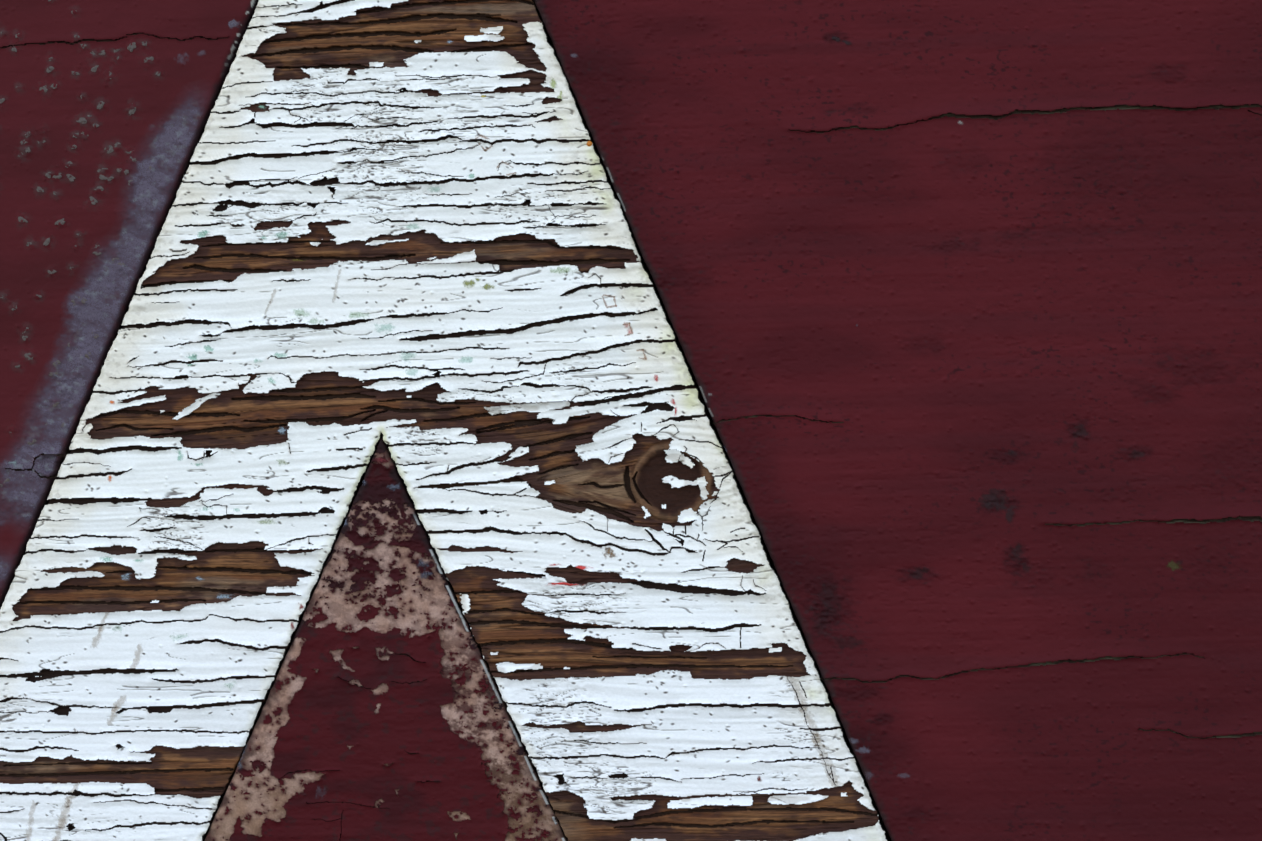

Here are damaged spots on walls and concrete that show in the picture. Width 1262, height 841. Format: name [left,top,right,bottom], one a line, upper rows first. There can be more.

crack [3,0,355,48]
peeling [239,0,563,123]
crack [789,104,1262,134]
peeling [140,220,644,289]
peeling [82,371,720,531]
crack [1045,515,1262,527]
peeling [0,498,881,841]
crack [506,652,1205,794]
crack [1138,728,1262,739]